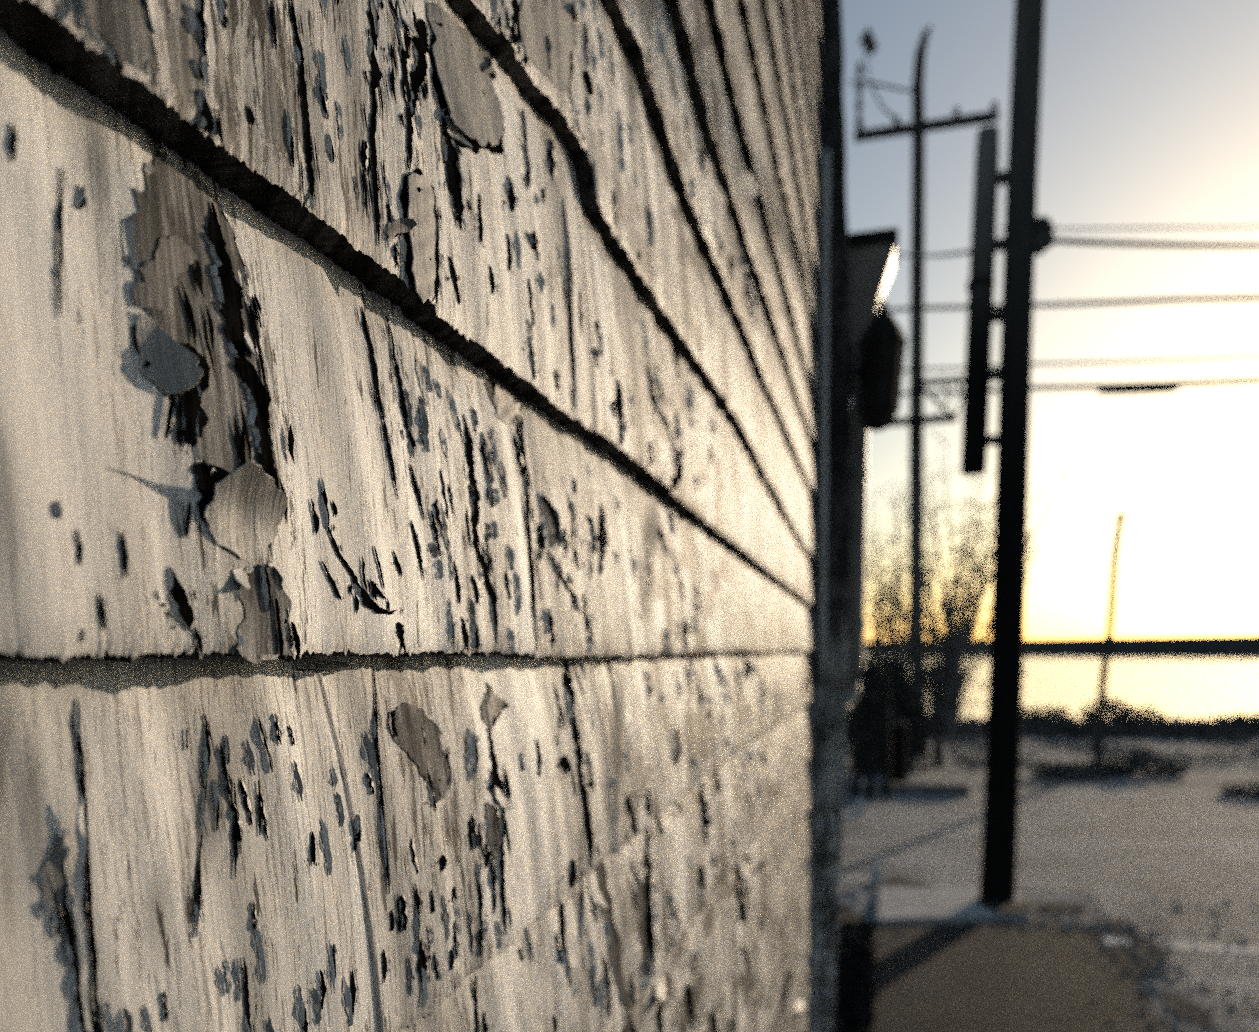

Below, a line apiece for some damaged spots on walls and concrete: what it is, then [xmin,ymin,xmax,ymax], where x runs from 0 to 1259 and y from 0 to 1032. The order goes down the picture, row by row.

peeling [385,0,505,305]
peeling [125,151,350,671]
peeling [39,795,169,1032]
peeling [220,713,303,843]
peeling [320,767,345,875]
peeling [390,702,477,811]
peeling [407,894,503,1007]
peeling [472,785,513,897]
peeling [481,682,509,737]
peeling [565,594,597,792]
peeling [556,827,680,1032]
peeling [644,511,767,858]